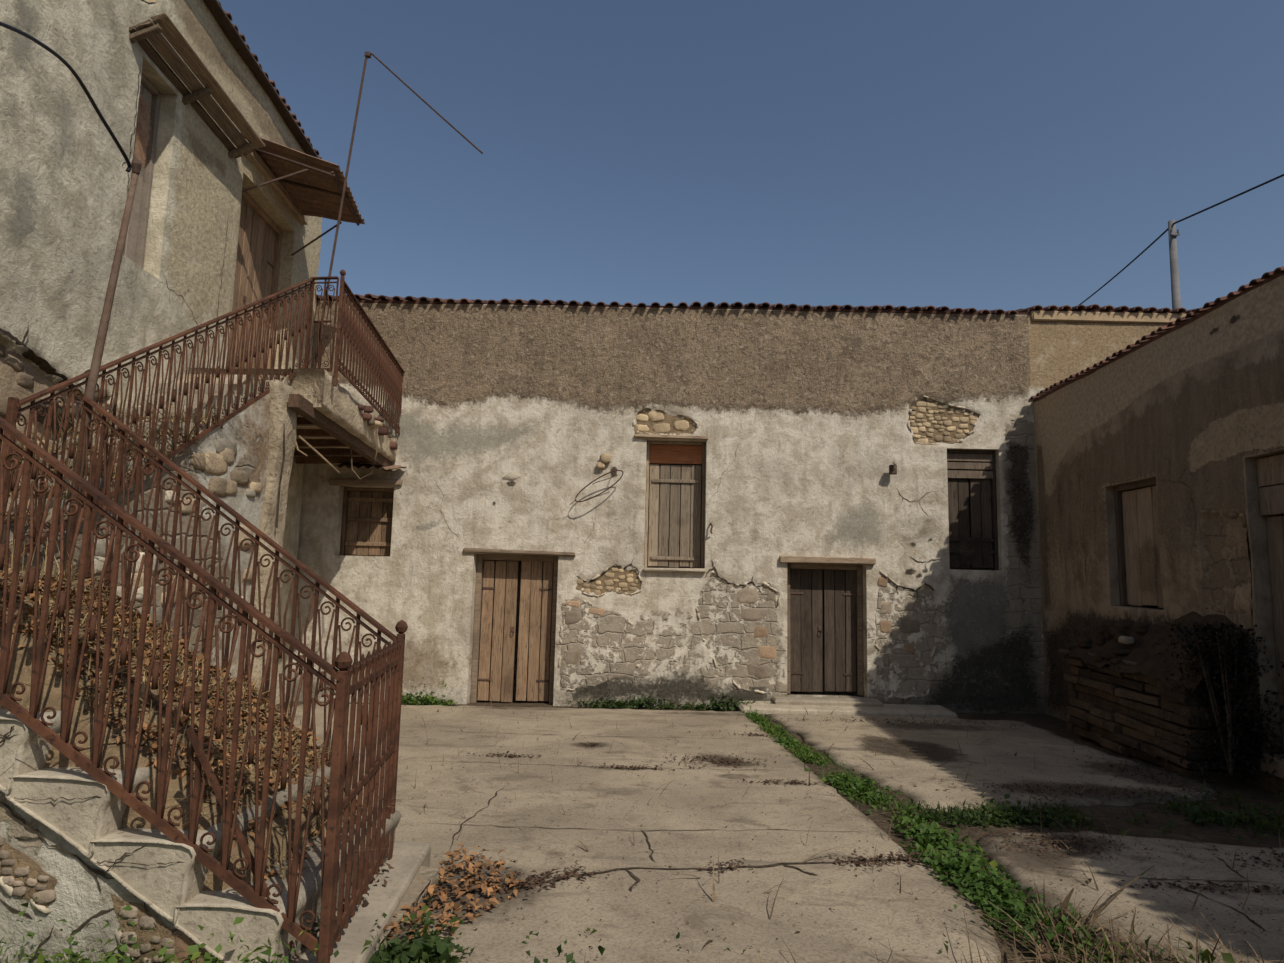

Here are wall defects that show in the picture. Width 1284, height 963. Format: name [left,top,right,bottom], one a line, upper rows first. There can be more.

flaking render [311,302,1031,445]
flaking render [165,438,262,514]
damp [1037,342,1284,607]
flaking render [558,566,646,691]
flaking render [696,571,780,694]
flaking render [875,569,941,700]
damp [926,624,1040,712]
spalling [0,837,57,913]
crack [425,731,935,898]